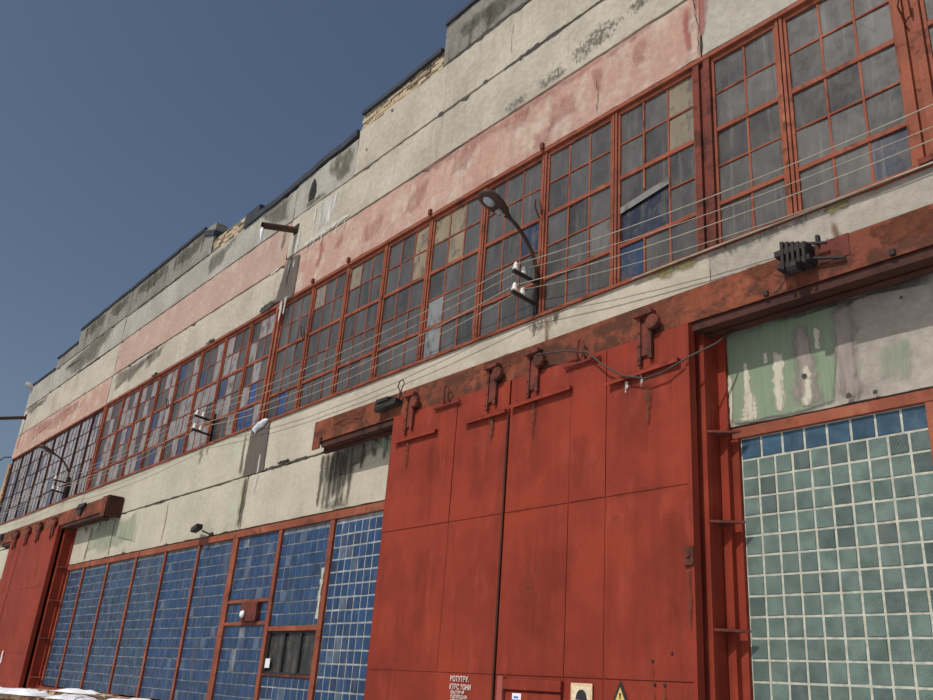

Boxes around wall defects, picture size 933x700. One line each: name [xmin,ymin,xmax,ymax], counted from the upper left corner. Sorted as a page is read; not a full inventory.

rust [871,208,933,245]
rust [745,261,781,279]
rust [497,350,524,369]
peeling [726,303,861,423]
rust [334,407,365,425]
leakage [316,436,388,511]